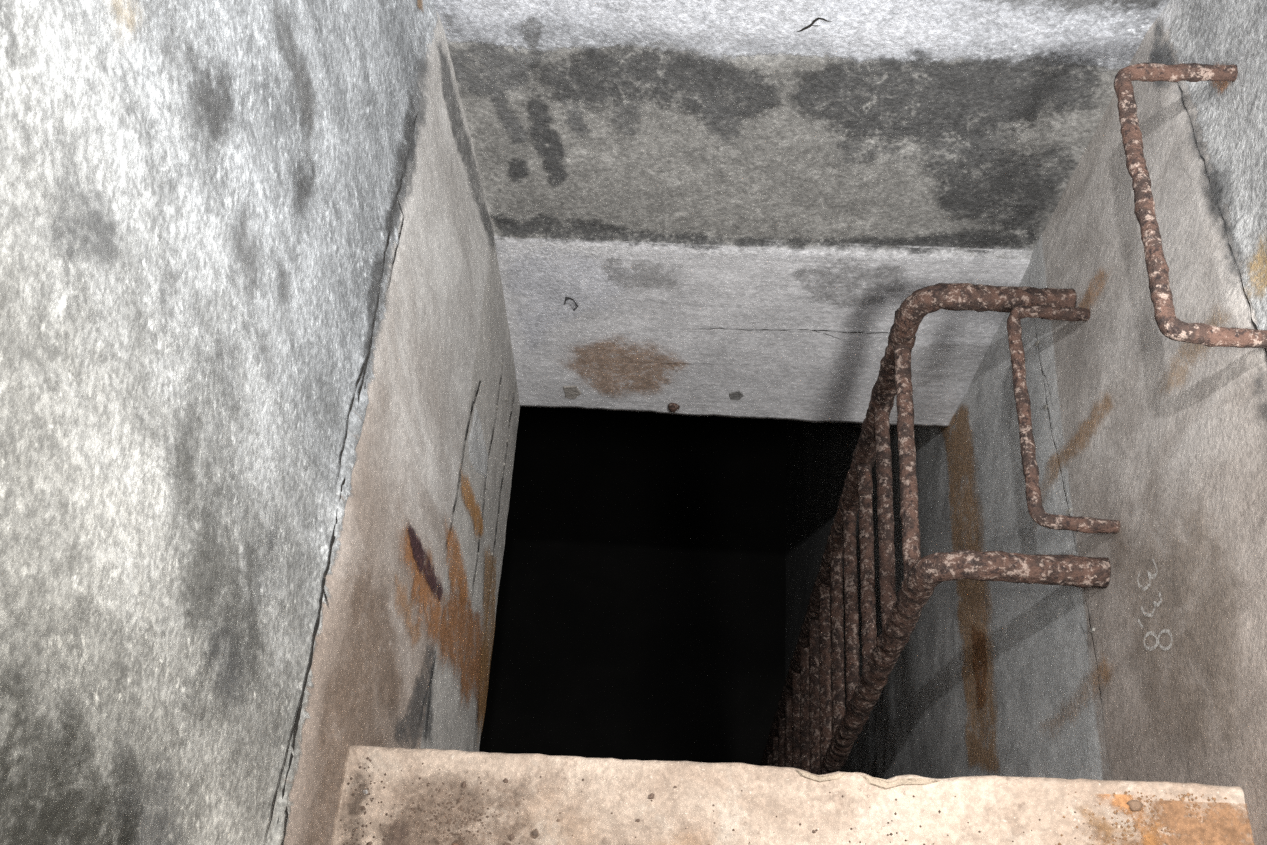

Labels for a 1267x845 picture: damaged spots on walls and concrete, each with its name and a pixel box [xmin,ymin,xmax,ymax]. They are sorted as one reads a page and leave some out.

damp [163,27,228,136]
damp [275,5,316,210]
damp [1048,0,1180,65]
damp [364,0,1117,368]
corrosion [571,343,682,393]
damp [179,446,262,669]
corrosion [404,526,496,730]
corrosion [461,475,483,534]
corrosion [941,407,984,552]
corrosion [957,579,999,772]
damp [0,705,136,845]
corrosion [1083,794,1255,845]